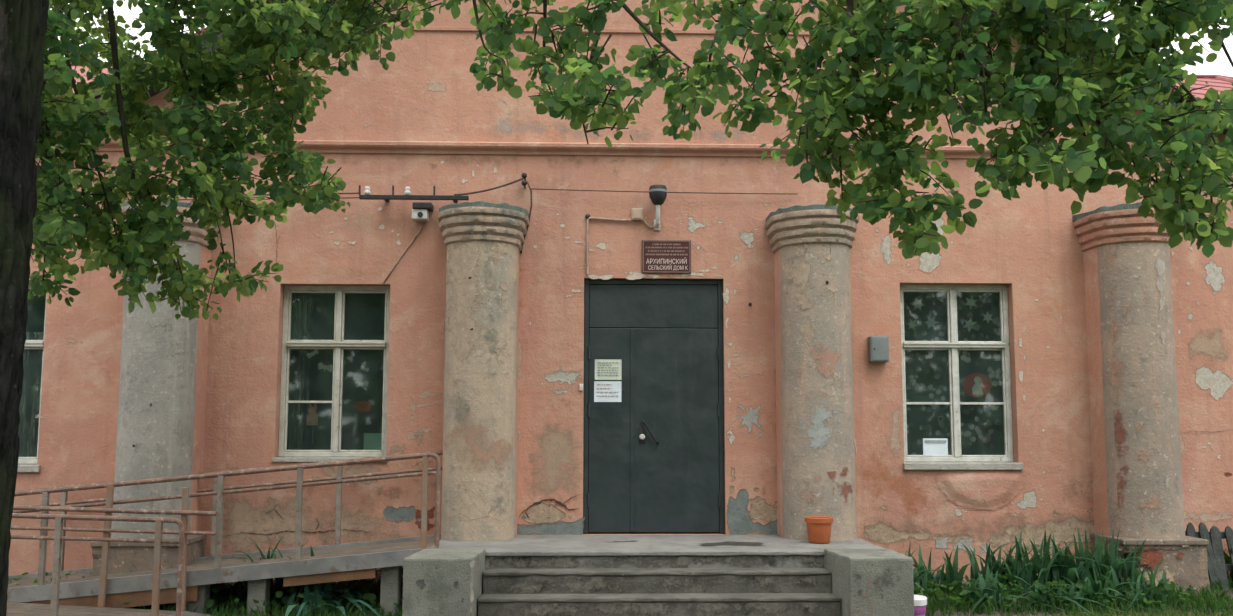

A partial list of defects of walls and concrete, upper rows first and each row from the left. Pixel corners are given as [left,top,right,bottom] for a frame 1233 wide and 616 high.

peeling [1186,255,1227,294]
peeling [445,242,508,383]
peeling [1161,301,1233,400]
peeling [536,366,582,395]
peeling [727,388,763,444]
peeling [800,393,840,452]
spalling [383,506,435,531]
crack [449,494,579,522]
spalling [517,502,584,535]
spalling [727,467,778,535]